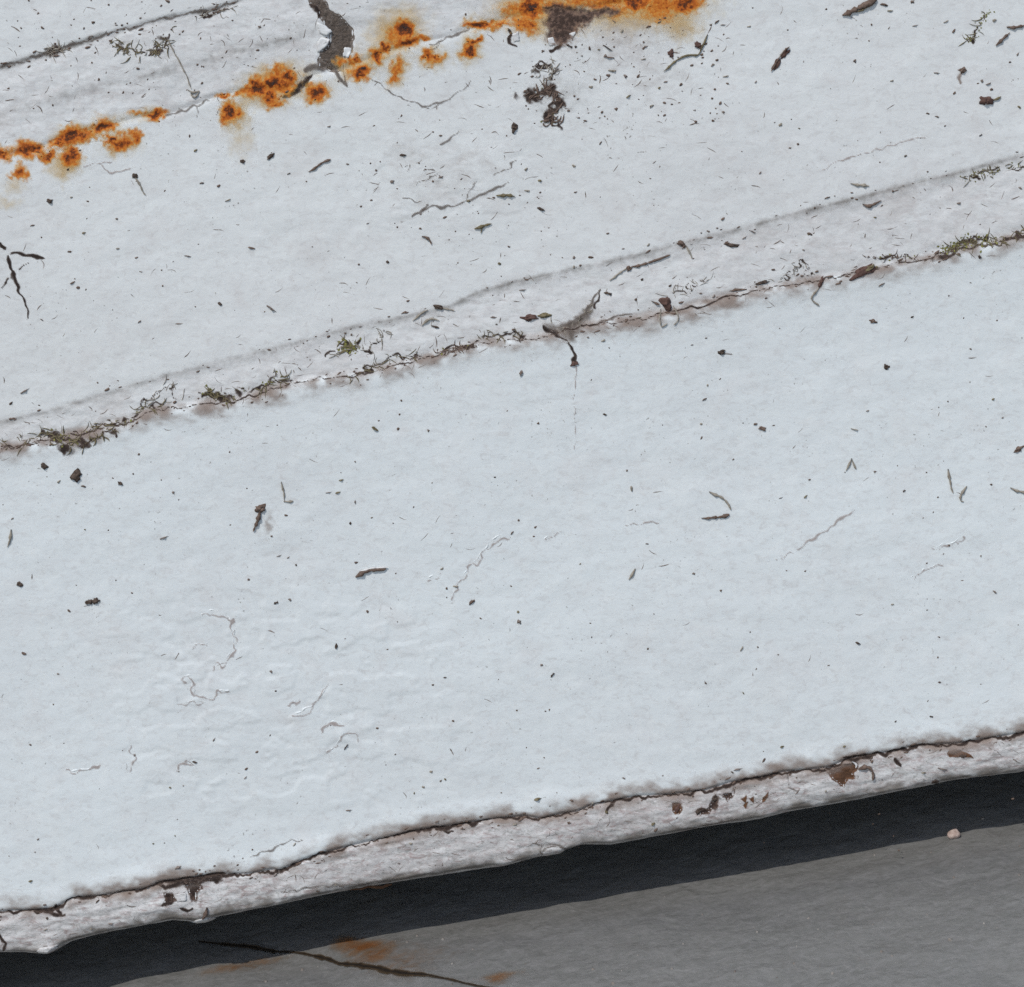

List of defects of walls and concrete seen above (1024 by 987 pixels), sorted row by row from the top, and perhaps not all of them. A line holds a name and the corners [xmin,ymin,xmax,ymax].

spalling [282,0,355,98]
rust [333,0,705,84]
rust [215,63,329,125]
rust [0,107,167,180]
crack [0,235,1024,449]
peeling [695,789,776,815]
peeling [827,761,875,787]
peeling [155,872,226,912]